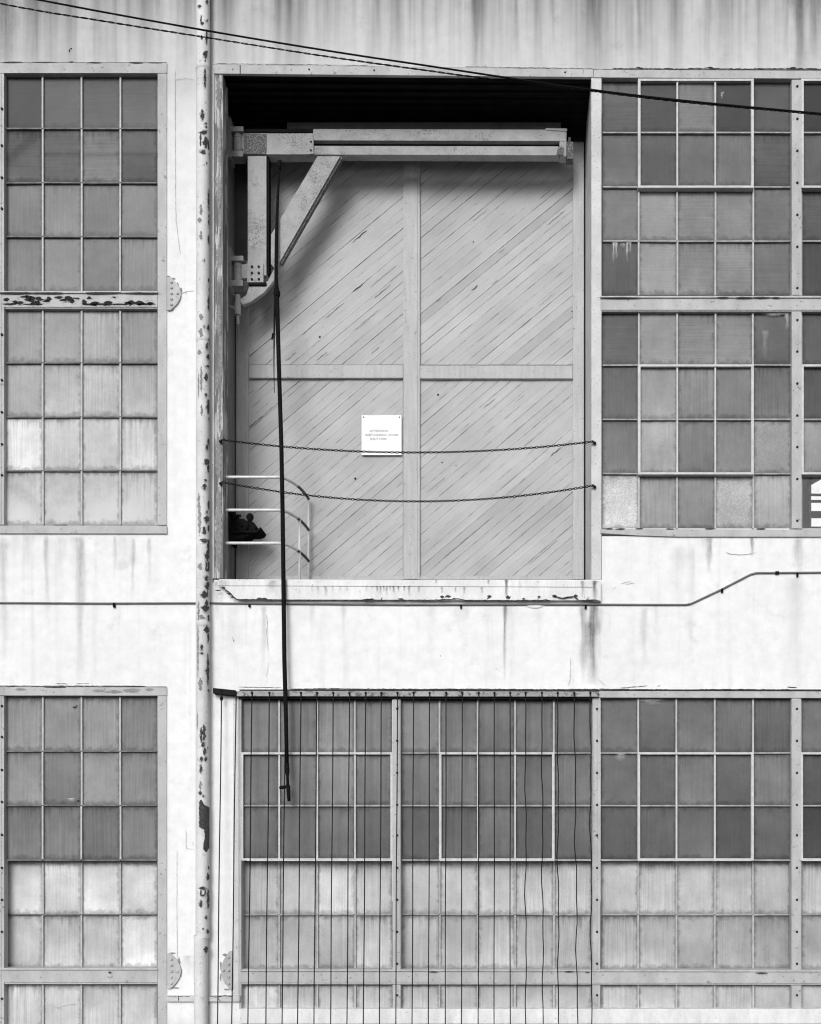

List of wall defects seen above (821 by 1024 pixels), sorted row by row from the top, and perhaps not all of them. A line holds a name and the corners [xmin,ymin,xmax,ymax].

peeling [197,0,222,109]
peeling [197,109,223,268]
peeling [0,292,156,307]
peeling [197,713,209,852]